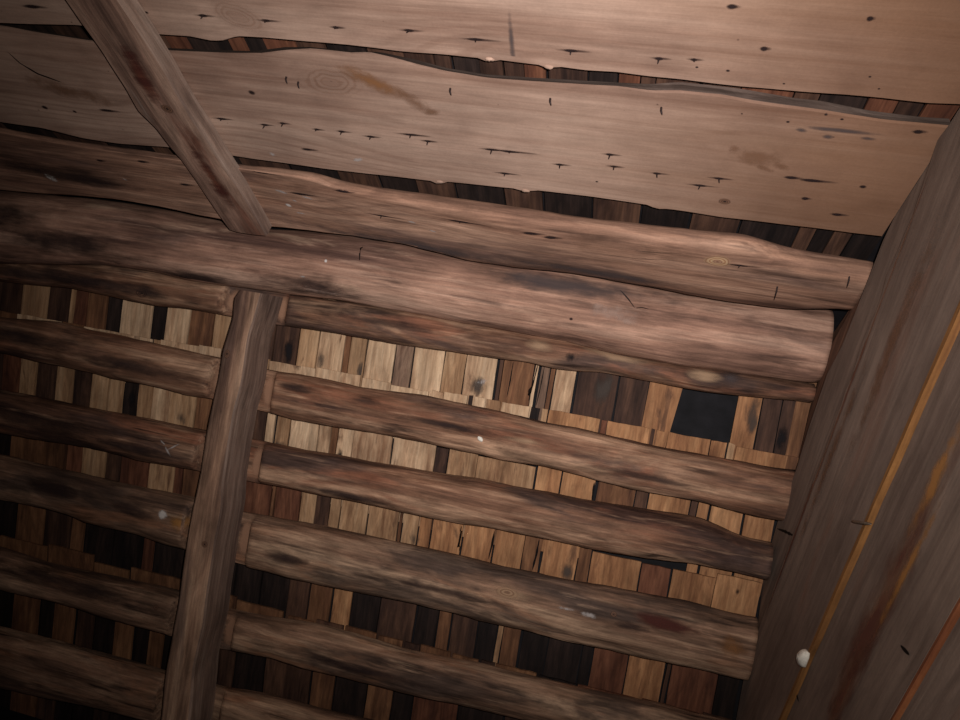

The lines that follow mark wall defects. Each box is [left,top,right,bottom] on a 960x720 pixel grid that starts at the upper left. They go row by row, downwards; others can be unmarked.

crack [9,53,60,82]